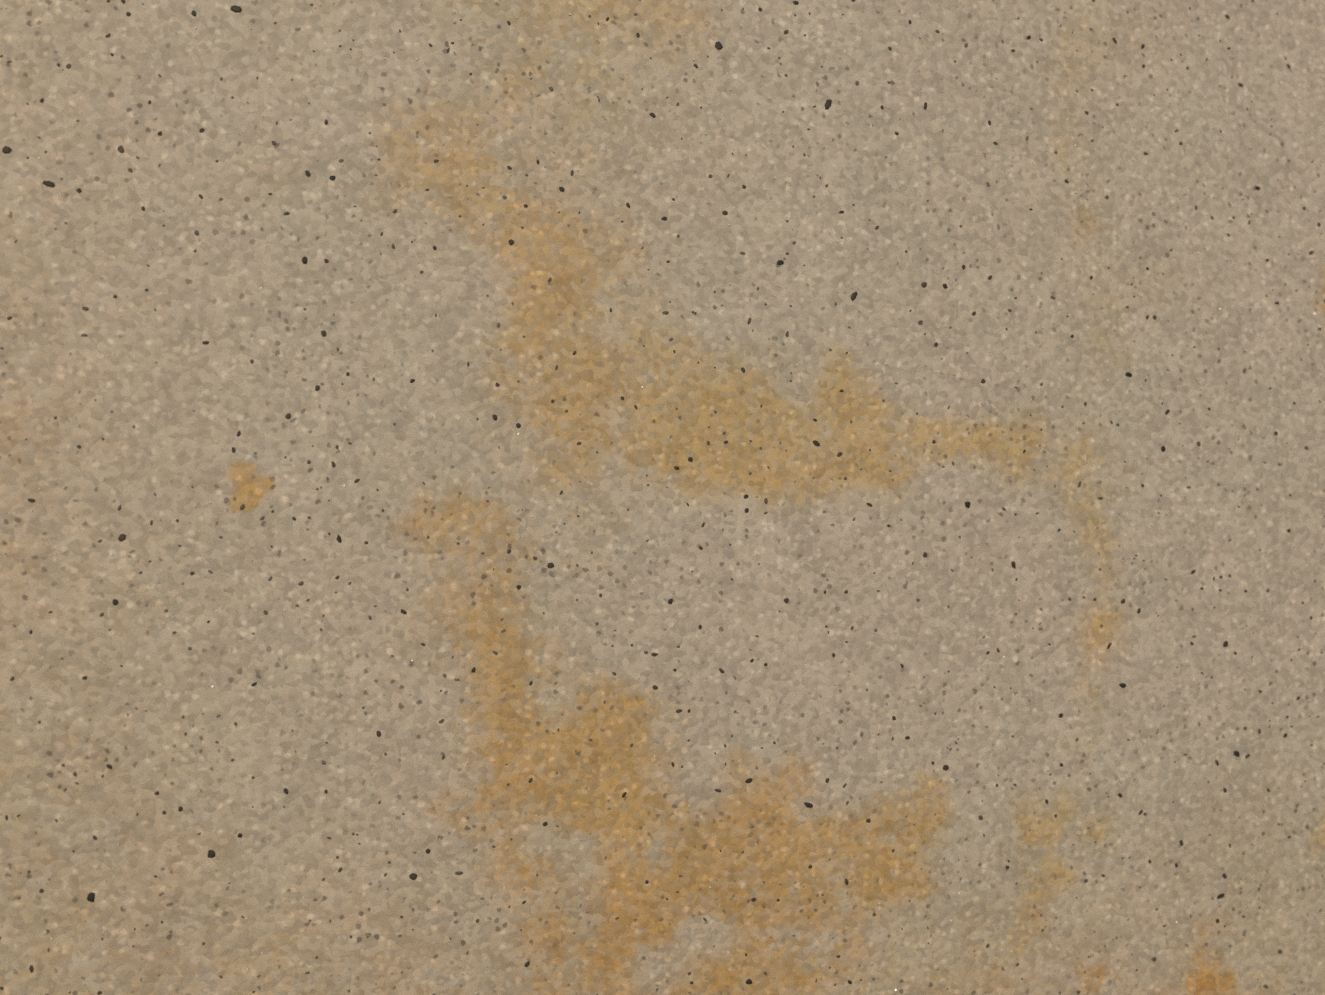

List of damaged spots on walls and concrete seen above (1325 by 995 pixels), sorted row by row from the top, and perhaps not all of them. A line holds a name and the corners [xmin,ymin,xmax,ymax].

rust [222,458,281,519]
rust [350,74,1142,995]